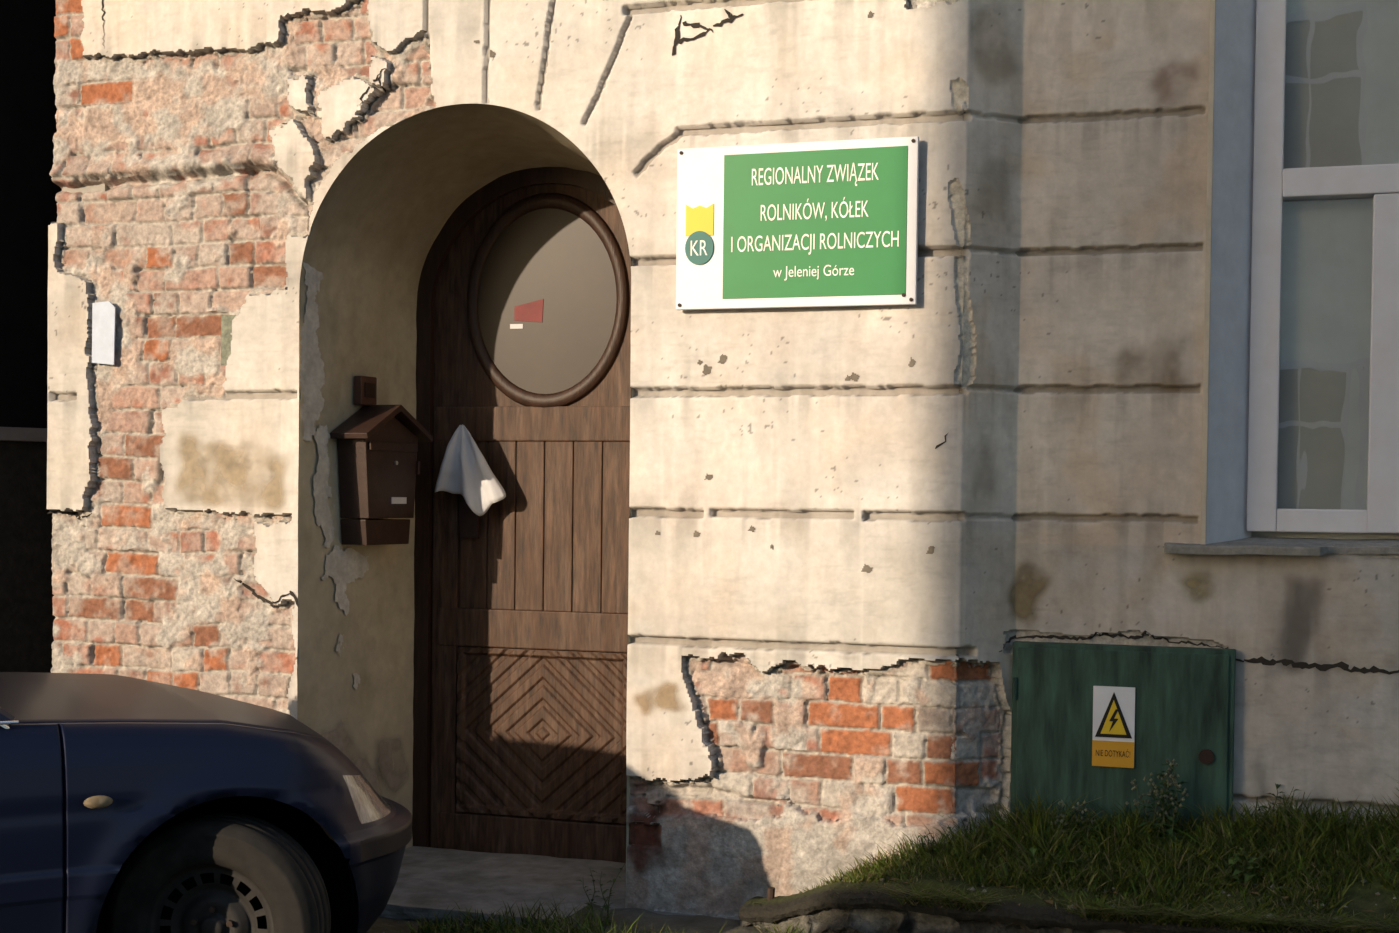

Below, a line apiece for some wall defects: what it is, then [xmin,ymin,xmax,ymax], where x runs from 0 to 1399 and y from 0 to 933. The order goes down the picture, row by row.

crack [672,9,743,56]
spalling [904,0,958,10]
spalling [48,0,436,715]
damp [1009,565,1046,620]
crack [999,630,1399,675]
spalling [626,629,1229,918]